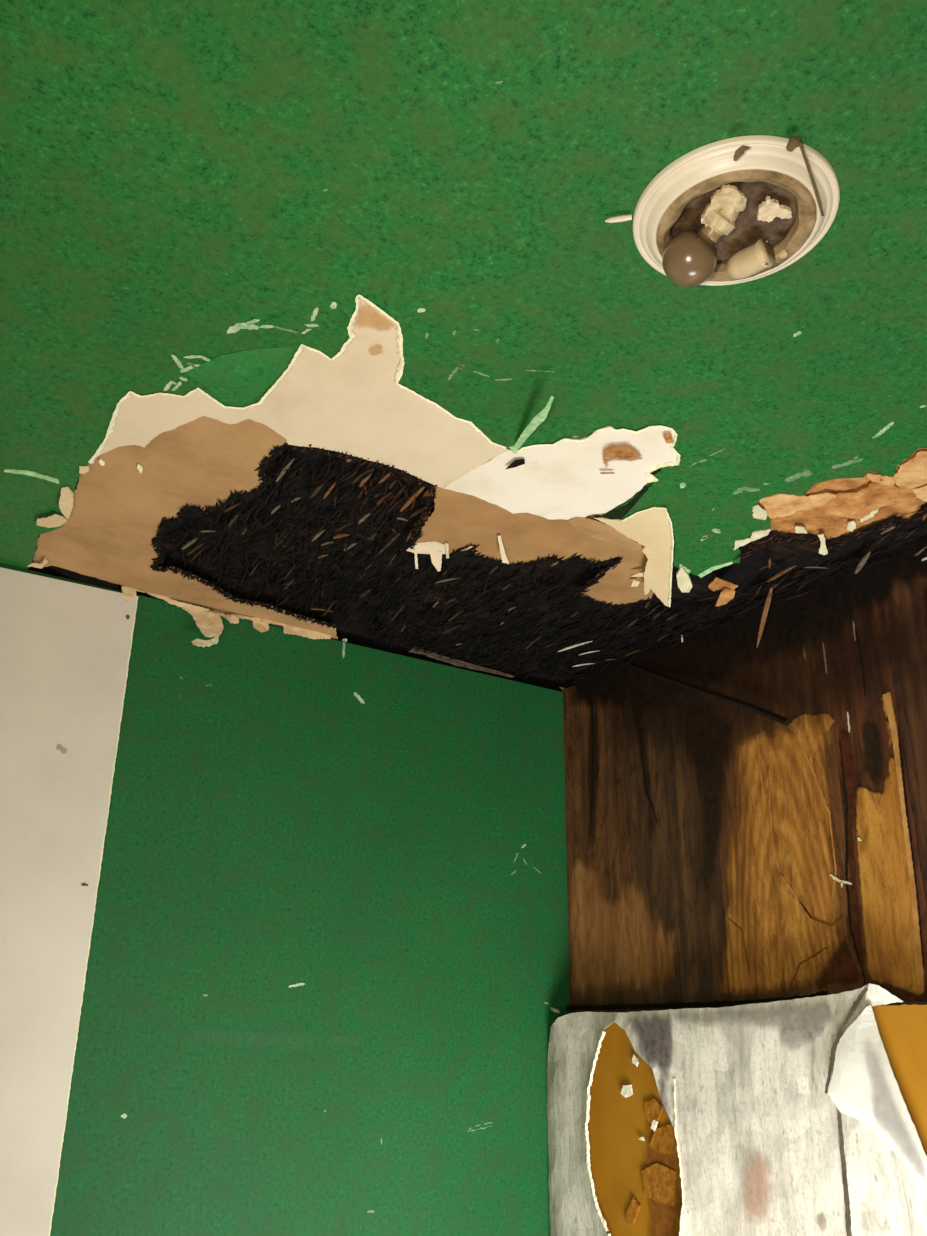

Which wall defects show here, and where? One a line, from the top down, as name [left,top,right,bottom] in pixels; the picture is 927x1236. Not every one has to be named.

peeling [4,469,74,528]
peeling [121,586,347,658]
peeling [79,294,725,520]
peeling [409,647,515,678]
leakage [573,534,927,899]
peeling [847,509,878,532]
leakage [635,1004,830,1107]
peeling [544,692,927,1236]
crack [824,741,868,1236]
leakage [816,725,881,987]